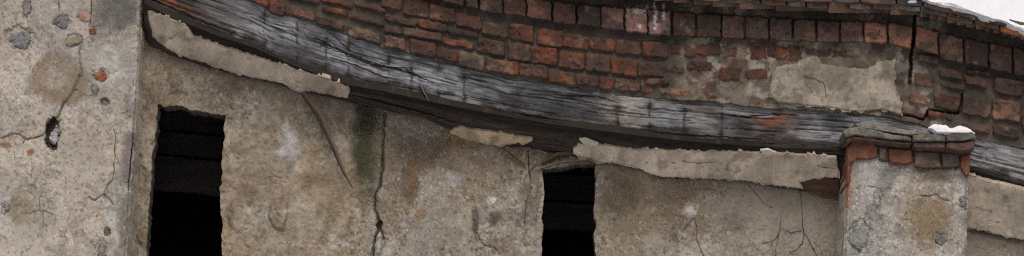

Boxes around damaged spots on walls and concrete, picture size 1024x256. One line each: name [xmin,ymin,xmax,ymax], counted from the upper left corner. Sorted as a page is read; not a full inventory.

crack [0,0,92,144]
crack [908,15,916,84]
spalling [45,117,61,152]
crack [89,132,134,205]
crack [373,119,385,256]
crack [749,186,817,256]
spalling [800,177,839,200]